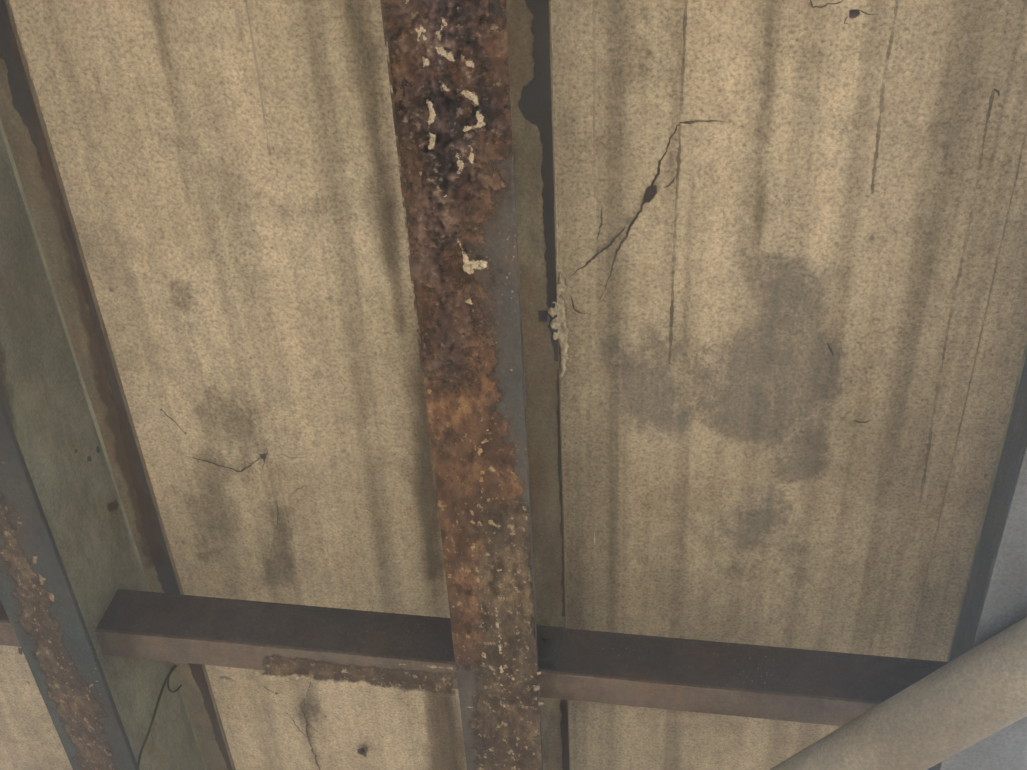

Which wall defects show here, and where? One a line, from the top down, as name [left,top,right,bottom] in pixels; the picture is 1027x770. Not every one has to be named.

crack [810,0,873,26]
rust [391,75,426,256]
crack [568,120,724,314]
rust [441,245,474,288]
rust [413,280,441,344]
rust [263,303,542,770]
crack [262,682,321,770]
crack [357,748,367,757]